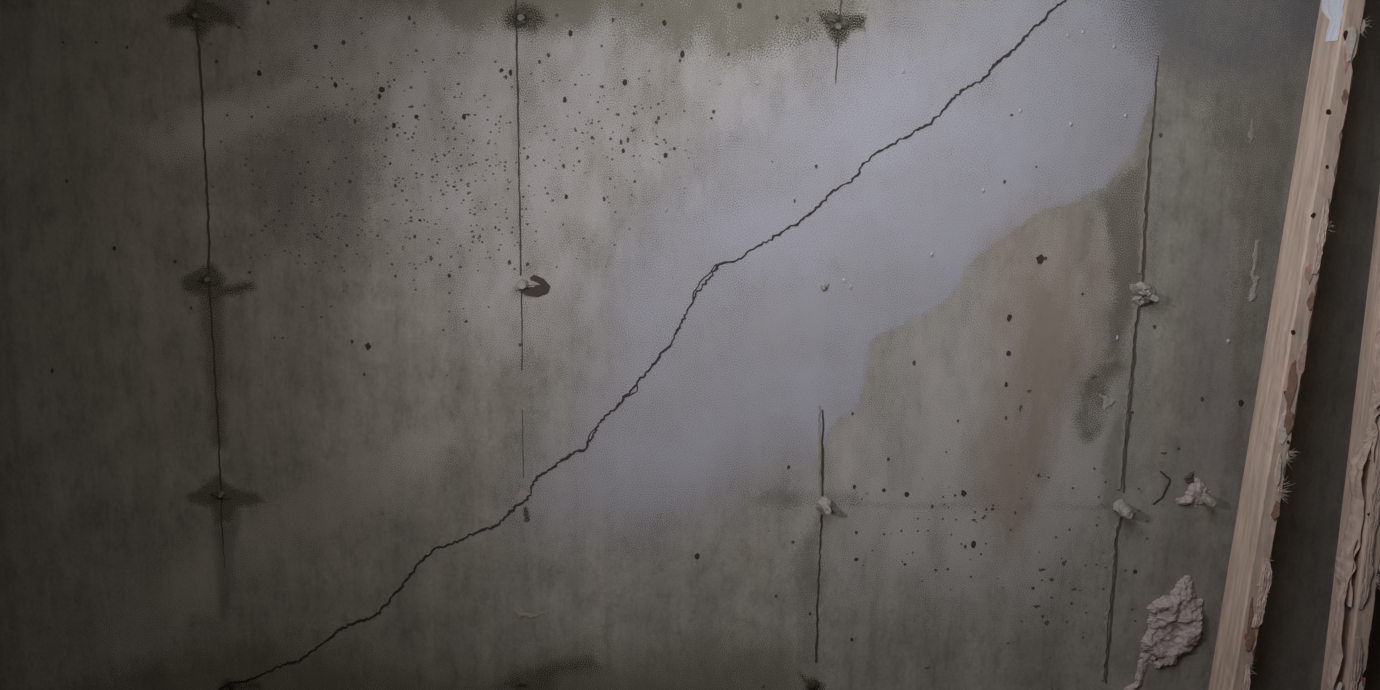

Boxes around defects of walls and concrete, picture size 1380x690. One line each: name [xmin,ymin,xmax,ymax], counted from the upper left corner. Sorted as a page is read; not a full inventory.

crack [218,0,1066,690]